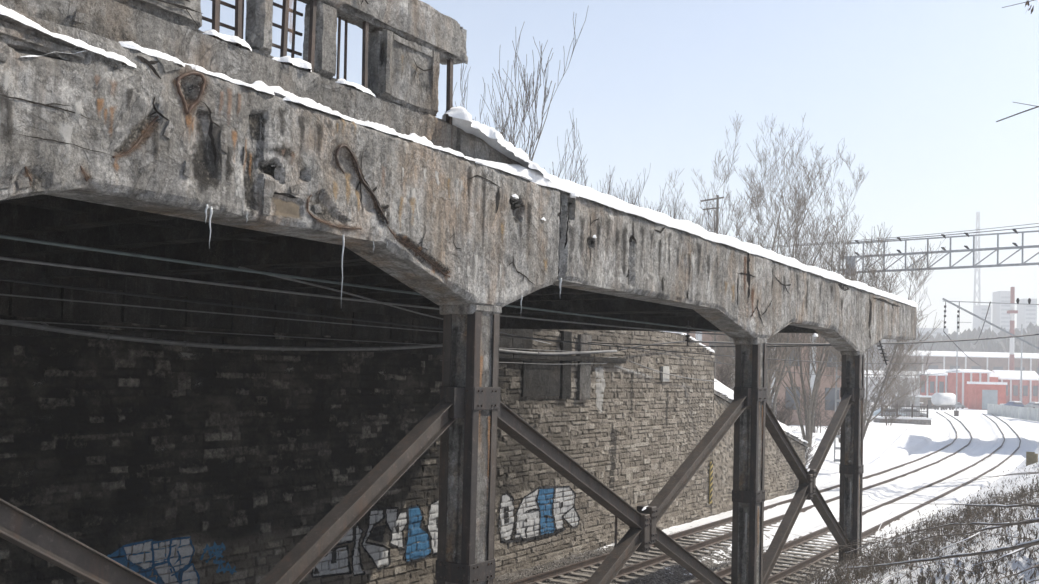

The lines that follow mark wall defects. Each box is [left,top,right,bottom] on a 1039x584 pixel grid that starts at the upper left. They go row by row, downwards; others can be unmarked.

crack [0,94,92,120]
crack [19,134,112,156]
spalling [112,111,175,158]
leakage [195,125,232,192]
spalling [334,144,451,278]
crack [737,253,791,324]